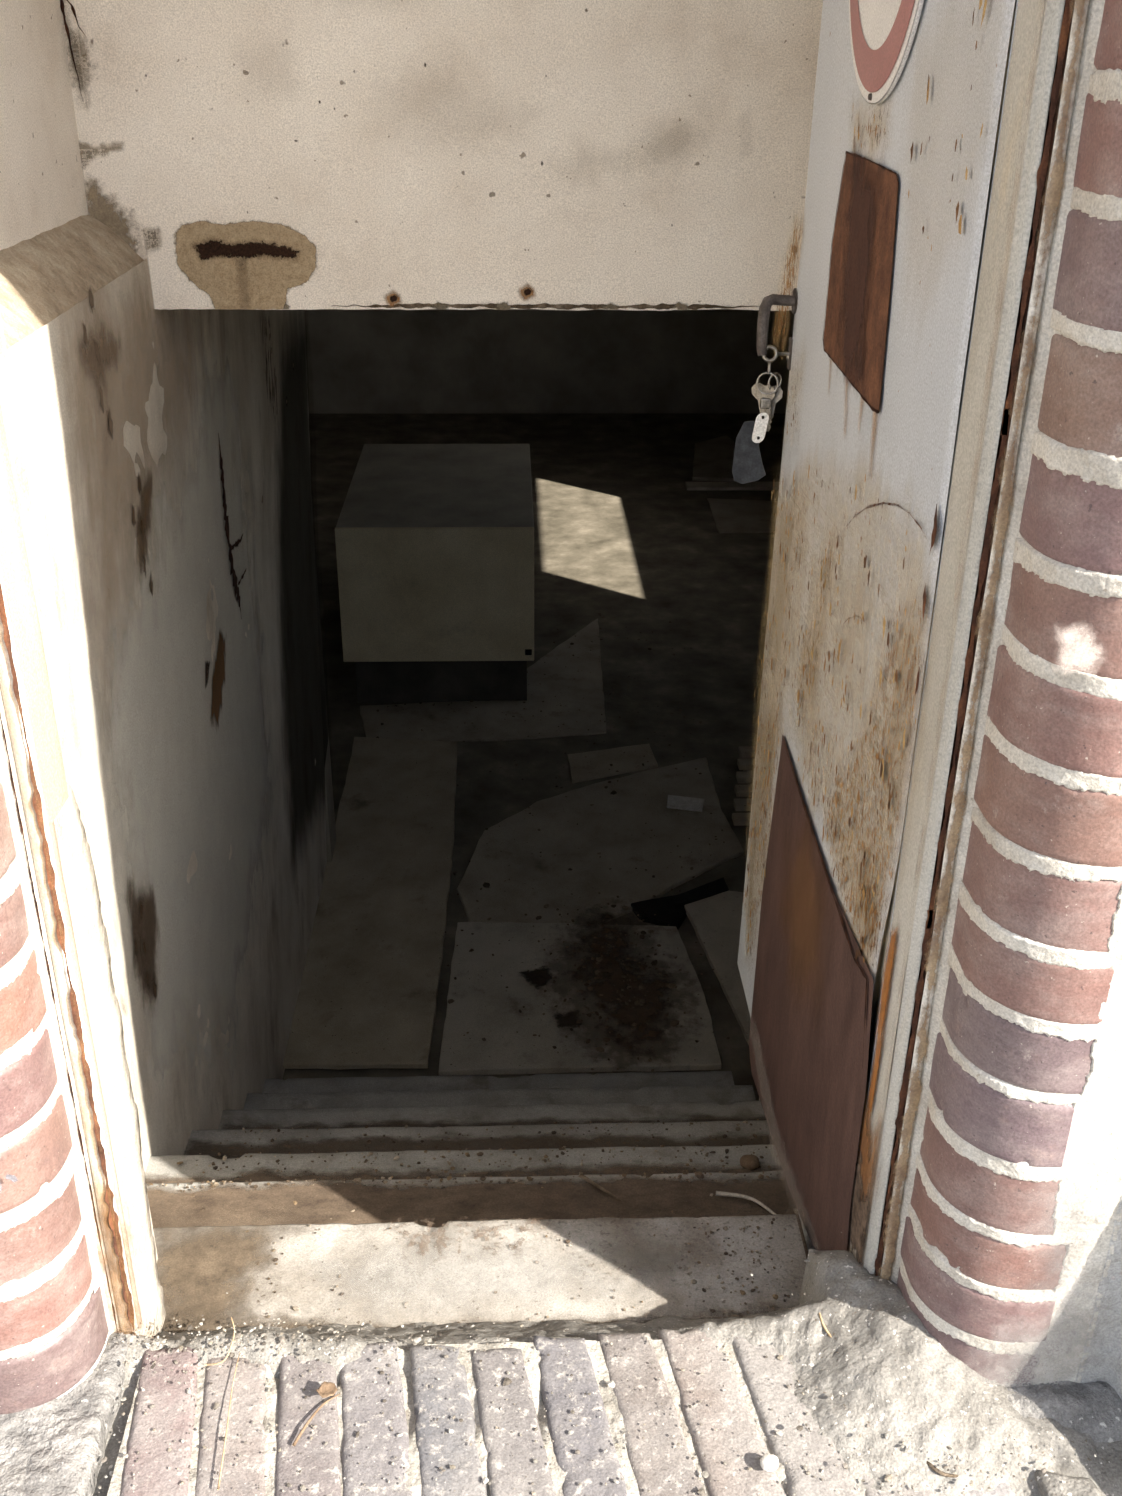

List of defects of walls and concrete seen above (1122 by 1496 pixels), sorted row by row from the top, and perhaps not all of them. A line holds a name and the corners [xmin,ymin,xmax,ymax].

damp [85,181,159,252]
spalling [175,211,316,310]
spalling [333,302,760,310]
crack [218,433,247,619]
rust [205,632,225,726]
rust [742,0,1087,1280]
rust [0,583,137,1335]